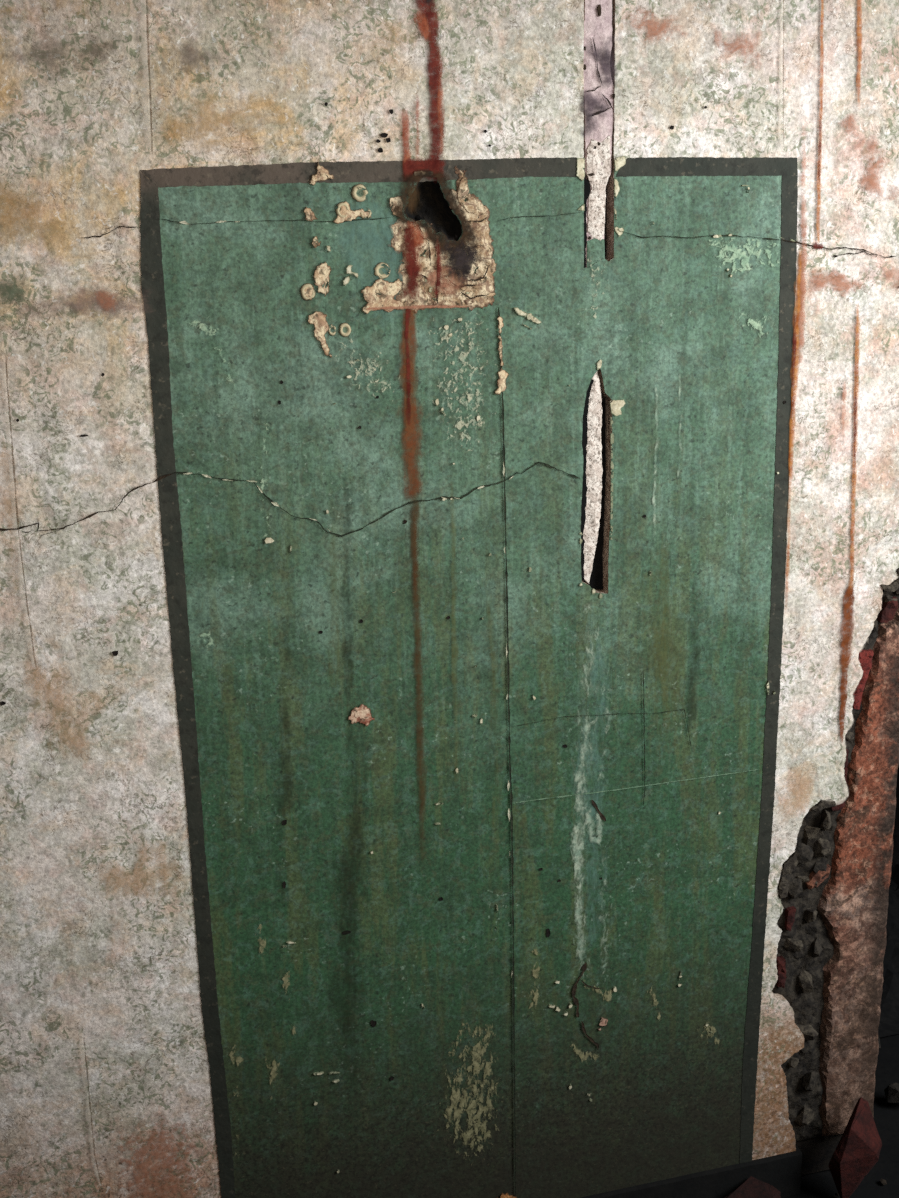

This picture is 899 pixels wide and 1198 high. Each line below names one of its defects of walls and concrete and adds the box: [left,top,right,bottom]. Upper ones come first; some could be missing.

crack [83,217,391,238]
flaking render [300,163,542,451]
rust [402,0,444,178]
crack [621,231,895,258]
rust [789,0,862,484]
rust [861,141,894,199]
rust [401,224,458,811]
rust [839,309,860,741]
crack [0,307,759,1197]
water stain [572,720,606,967]
flaking render [772,568,899,1141]
peeling [437,1023,503,1165]